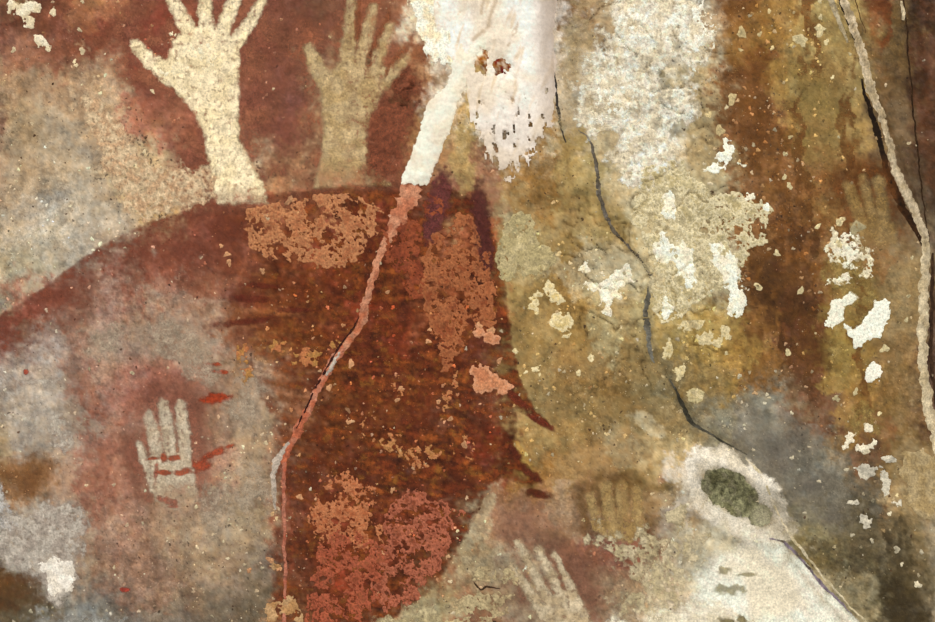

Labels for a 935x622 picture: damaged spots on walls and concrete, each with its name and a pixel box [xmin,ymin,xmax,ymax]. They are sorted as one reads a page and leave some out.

peeling [256,550,288,571]
crack [270,181,423,622]
peeling [263,470,466,622]
peeling [345,408,475,473]
peeling [217,0,801,421]
crack [554,75,655,363]
damp [560,0,720,293]
crack [669,379,866,622]
damp [822,256,877,331]
crack [828,0,935,454]